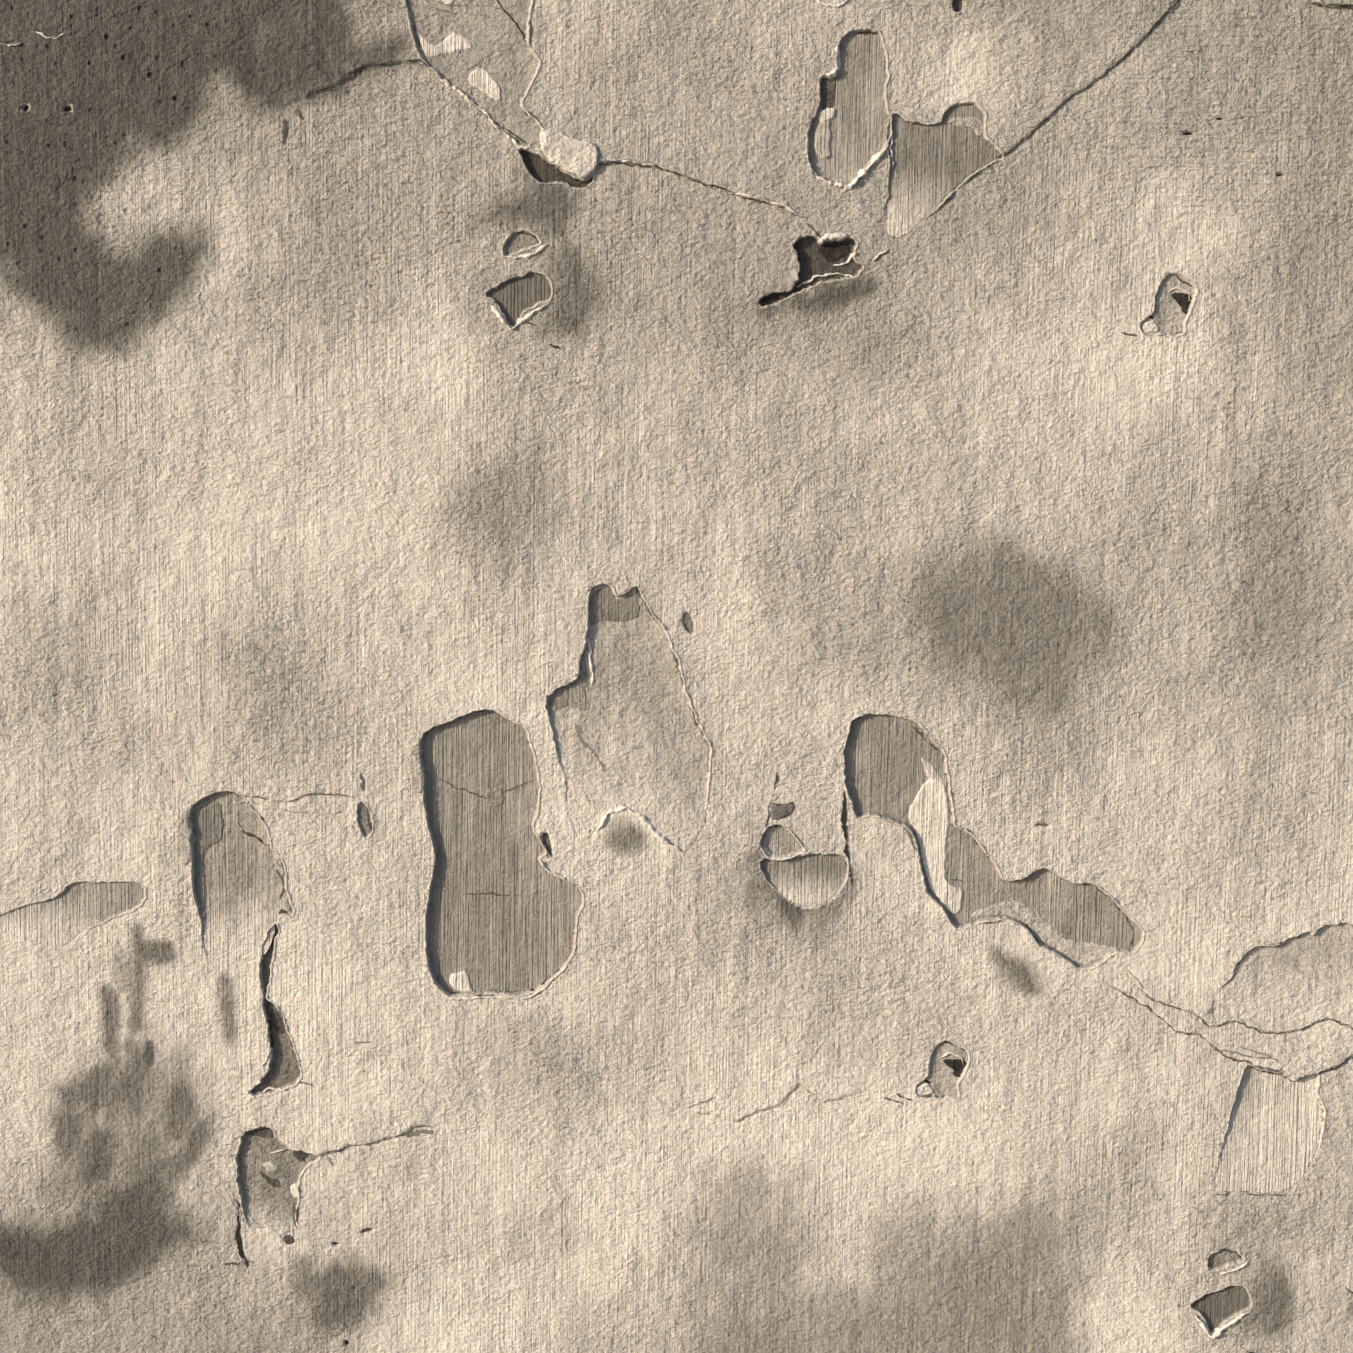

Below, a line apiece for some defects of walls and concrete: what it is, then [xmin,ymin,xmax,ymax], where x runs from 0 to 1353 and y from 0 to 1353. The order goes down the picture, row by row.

leakage [0,0,403,347]
spalling [405,0,599,191]
spalling [757,27,1005,308]
crack [1000,0,1180,158]
crack [1304,0,1353,10]
leakage [0,928,204,1297]
leakage [221,976,233,1039]
peeling [175,789,312,1098]
spalling [234,1126,321,1245]
peeling [408,707,585,1001]
peeling [544,582,713,854]
peeling [757,712,1145,970]